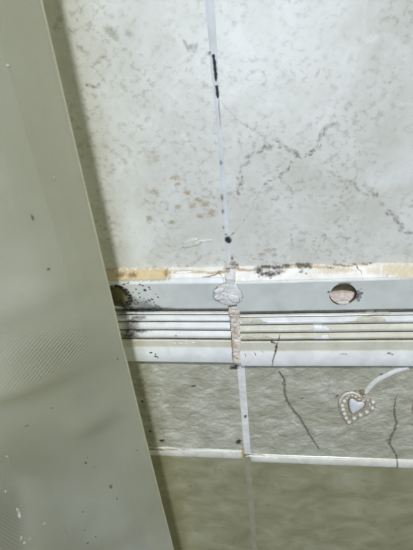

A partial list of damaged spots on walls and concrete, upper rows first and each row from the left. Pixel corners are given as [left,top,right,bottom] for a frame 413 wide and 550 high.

damp [106,268,183,338]
damp [257,263,325,279]
crack [271,335,319,449]
crack [389,396,398,468]